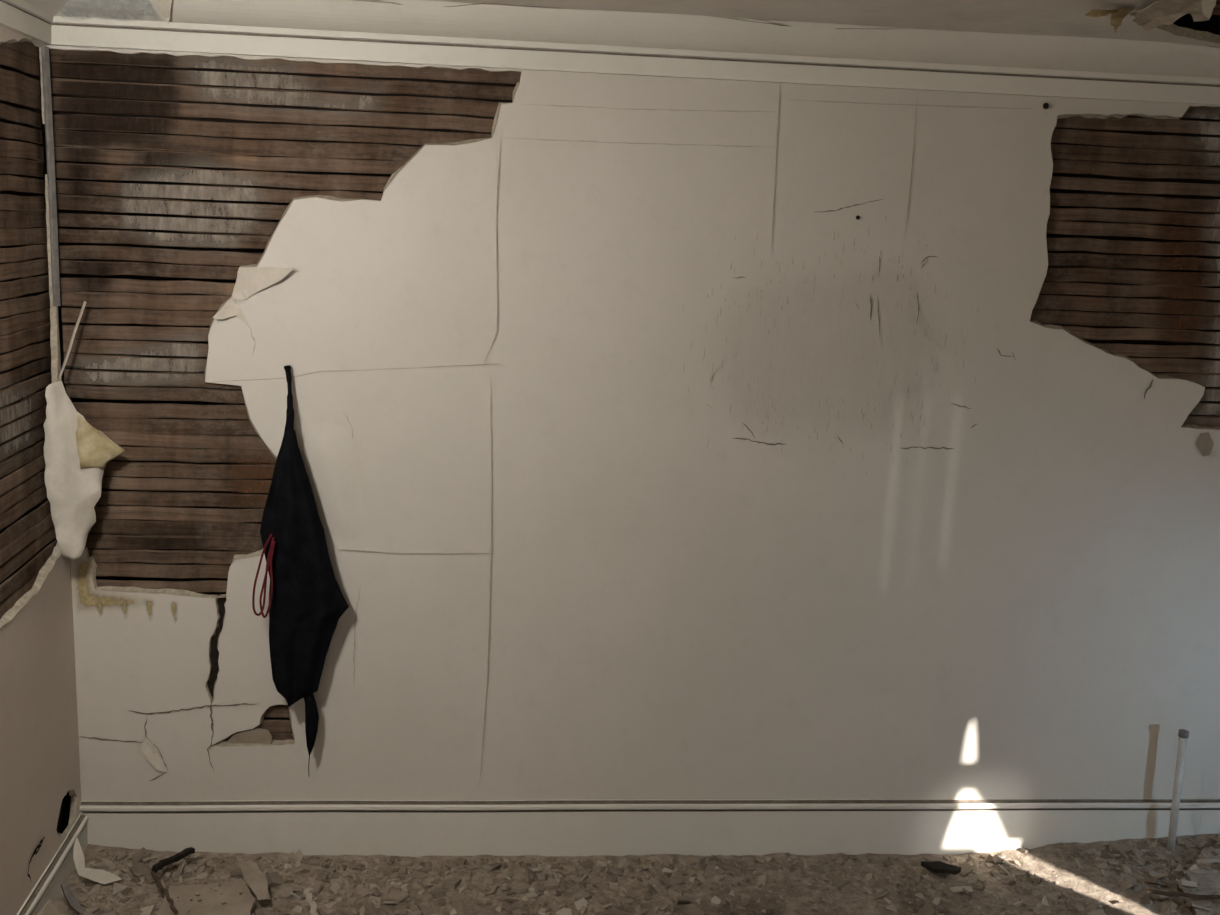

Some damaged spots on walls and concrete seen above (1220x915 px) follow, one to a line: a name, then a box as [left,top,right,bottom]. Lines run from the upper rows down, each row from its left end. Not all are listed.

flaking render [1085,0,1220,49]
flaking render [0,38,521,628]
flaking render [1030,106,1220,457]
crack [81,595,255,781]
flaking render [211,704,295,747]